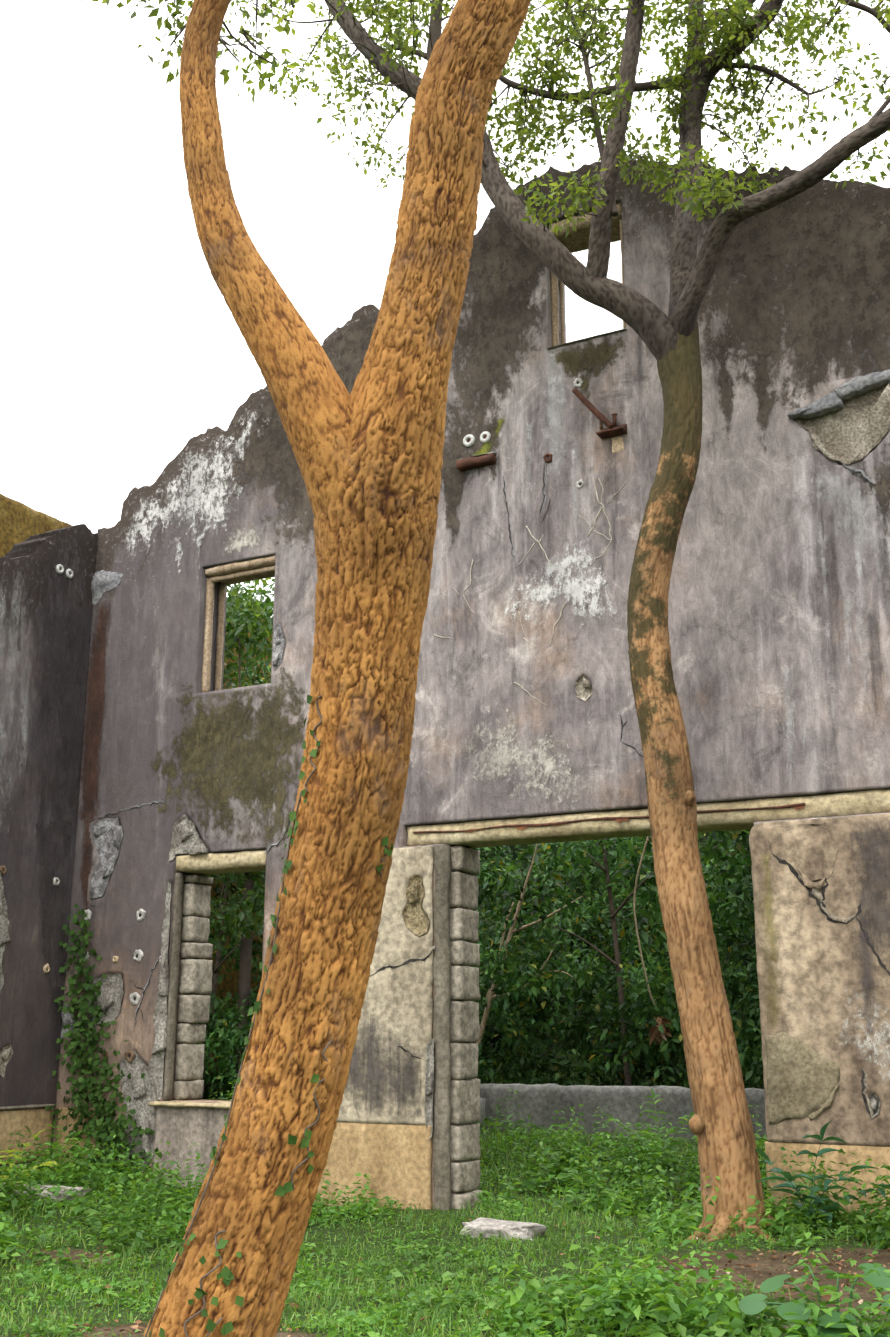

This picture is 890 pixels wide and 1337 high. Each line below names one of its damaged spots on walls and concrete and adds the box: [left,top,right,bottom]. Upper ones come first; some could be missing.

water stain [701,175,783,239]
water stain [323,313,378,394]
water stain [698,187,890,449]
water stain [127,391,314,571]
water stain [809,443,890,613]
efflorescence [506,545,614,625]
peeling [90,817,123,899]
spalling [0,873,11,991]
crack [772,853,890,975]
spalling [0,1044,13,1078]
crack [861,1069,874,1119]